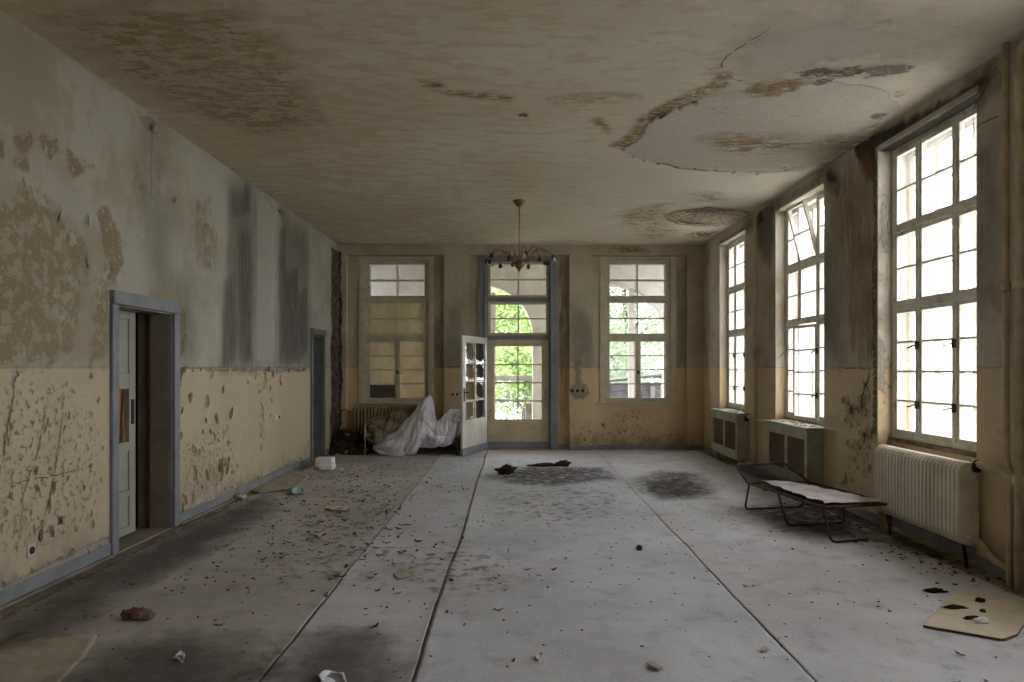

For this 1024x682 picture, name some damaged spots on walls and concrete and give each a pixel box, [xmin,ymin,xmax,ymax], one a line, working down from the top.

damp [79,13,305,127]
crack [709,28,770,85]
peeling [621,65,914,175]
peeling [85,207,123,275]
peeling [0,134,109,591]
peeling [180,394,242,513]
peeling [180,366,308,450]